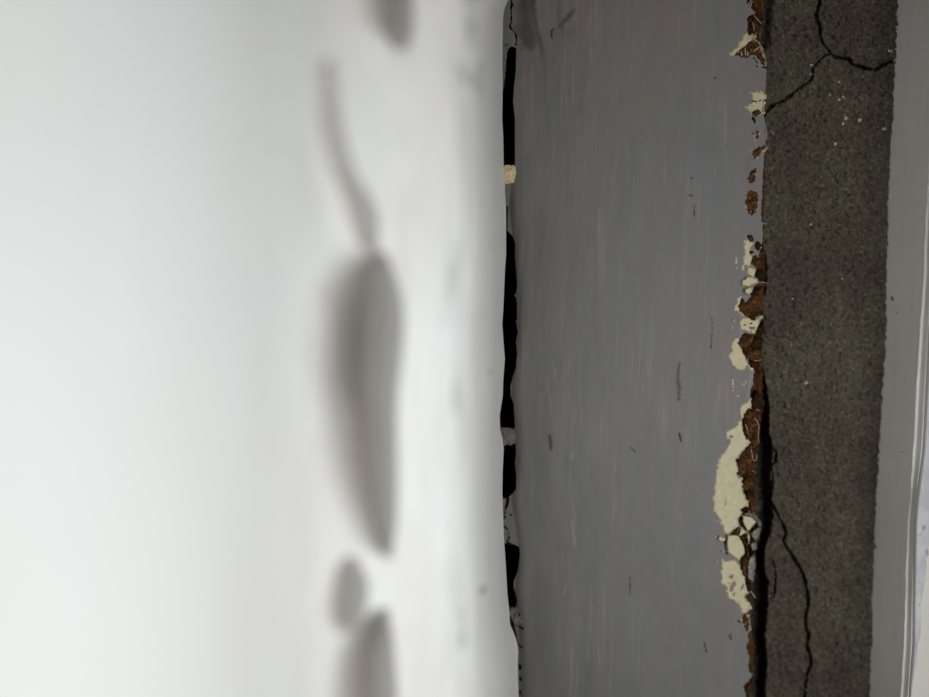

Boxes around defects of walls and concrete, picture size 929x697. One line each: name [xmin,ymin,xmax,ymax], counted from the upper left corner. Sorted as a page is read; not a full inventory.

crack [765,0,893,116]
peeling [712,0,769,697]
crack [759,422,813,697]